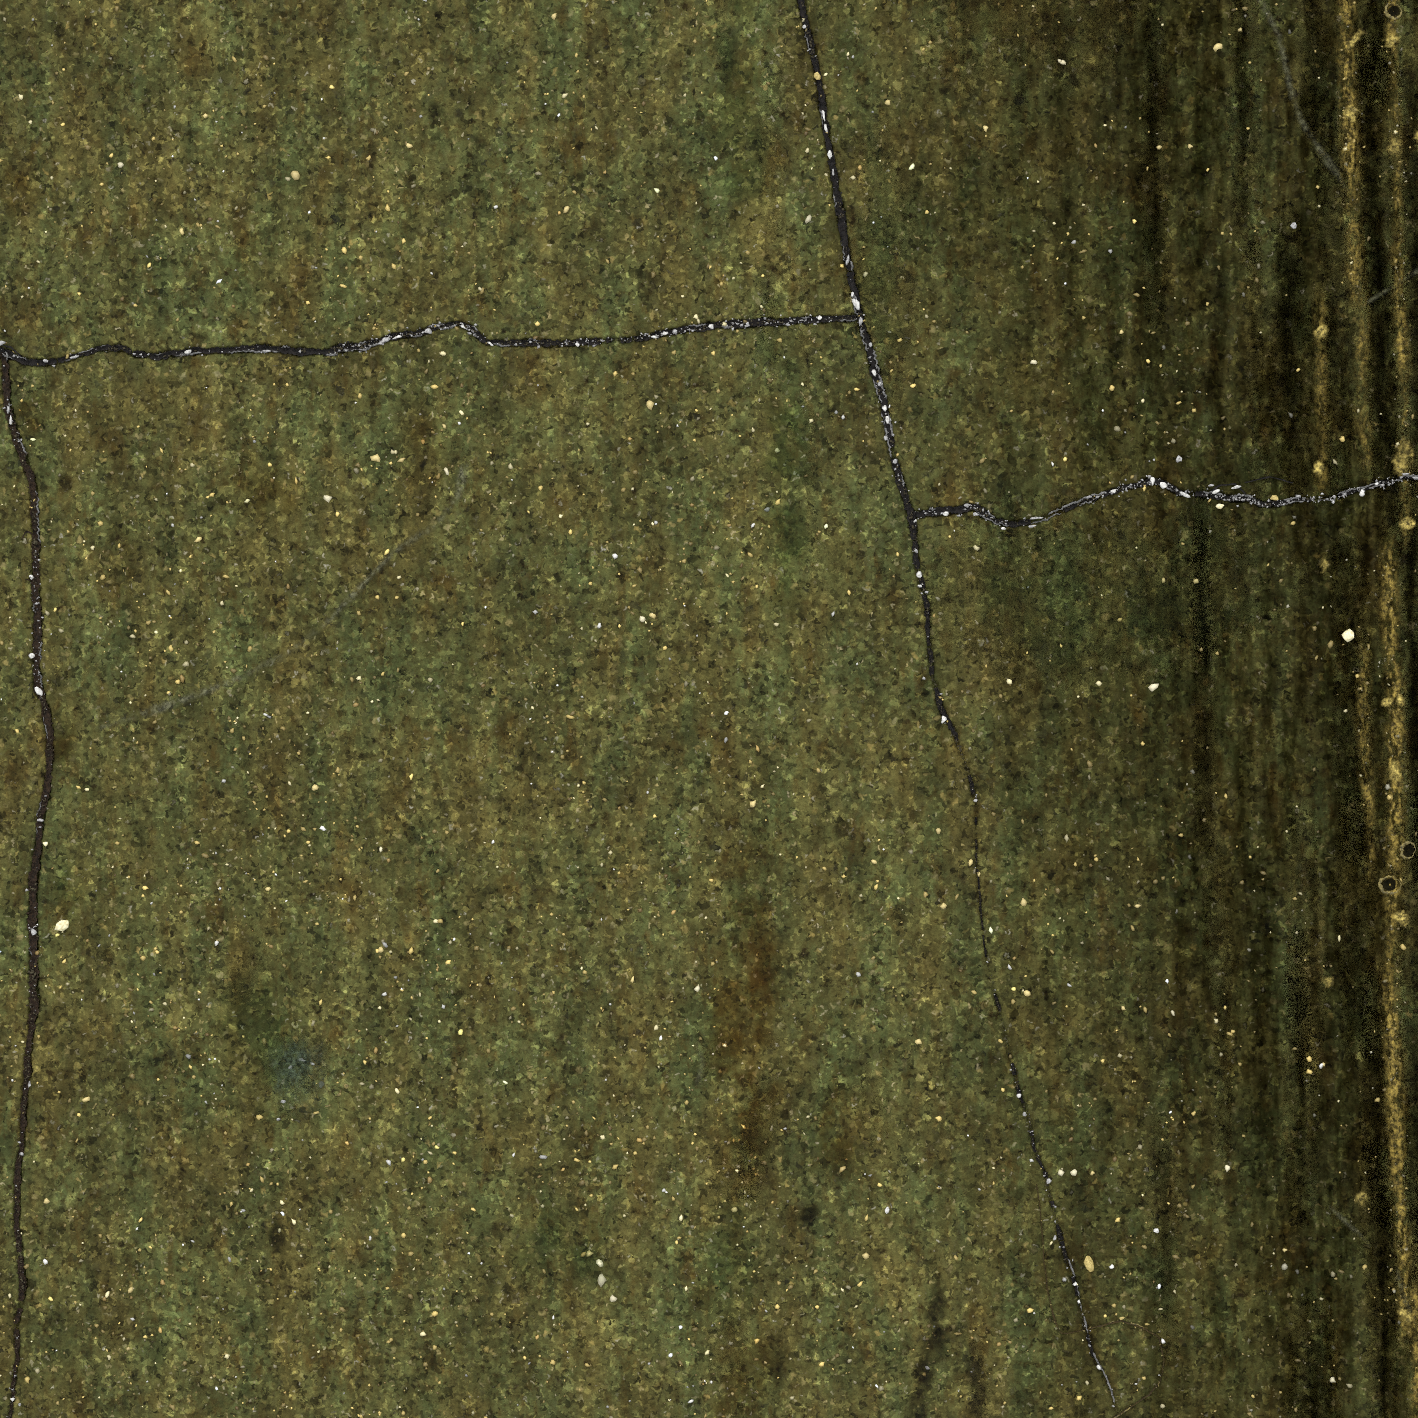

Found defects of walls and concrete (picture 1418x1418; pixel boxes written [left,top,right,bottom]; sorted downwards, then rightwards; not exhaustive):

crack [617,0,1418,768]
crack [0,321,612,1301]
crack [968,775,977,802]
crack [973,813,1001,1012]
water stain [1111,0,1418,1418]
crack [7,1308,23,1418]
crack [1008,1053,1165,1418]